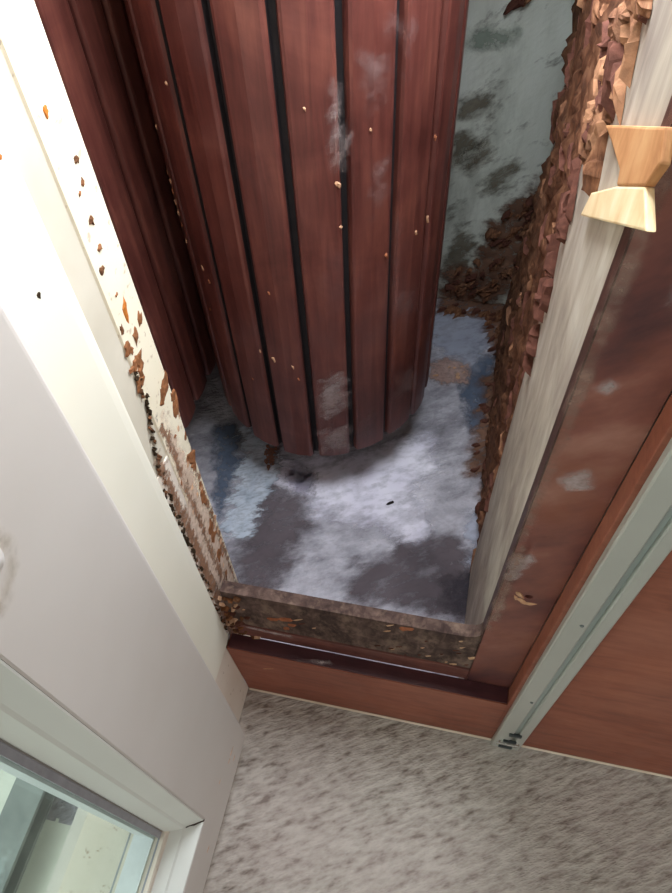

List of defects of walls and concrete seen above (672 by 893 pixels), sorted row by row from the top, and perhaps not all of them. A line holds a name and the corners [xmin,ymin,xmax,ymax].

peeling [503,0,531,15]
damp [458,94,494,120]
damp [452,131,490,170]
damp [482,162,519,194]
peeling [153,413,238,635]
damp [212,423,479,621]